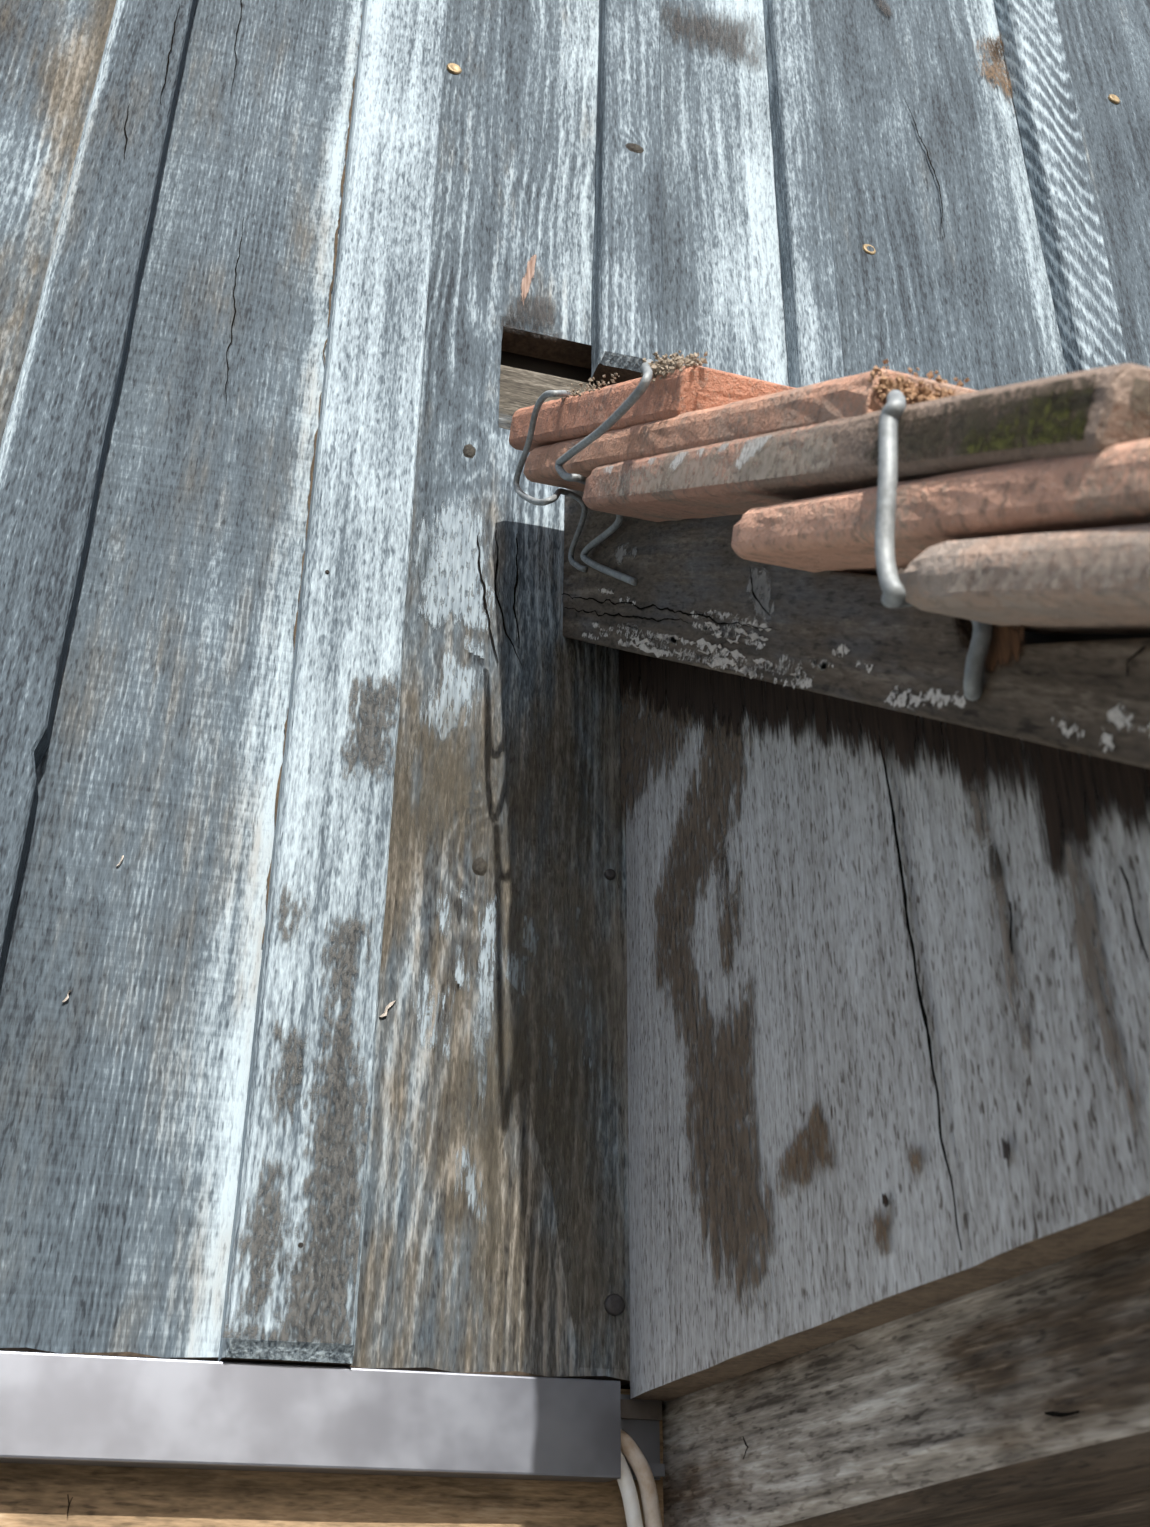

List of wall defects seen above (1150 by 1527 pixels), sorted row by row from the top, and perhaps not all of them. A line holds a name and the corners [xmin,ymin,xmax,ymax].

rust [977,34,1013,97]
crack [477,530,522,665]
crack [562,568,779,630]
peeling [582,609,873,689]
crack [1127,646,1146,677]
peeling [884,685,966,709]
peeling [1051,703,1150,753]
damp [464,644,1150,1358]
crack [880,743,962,1251]